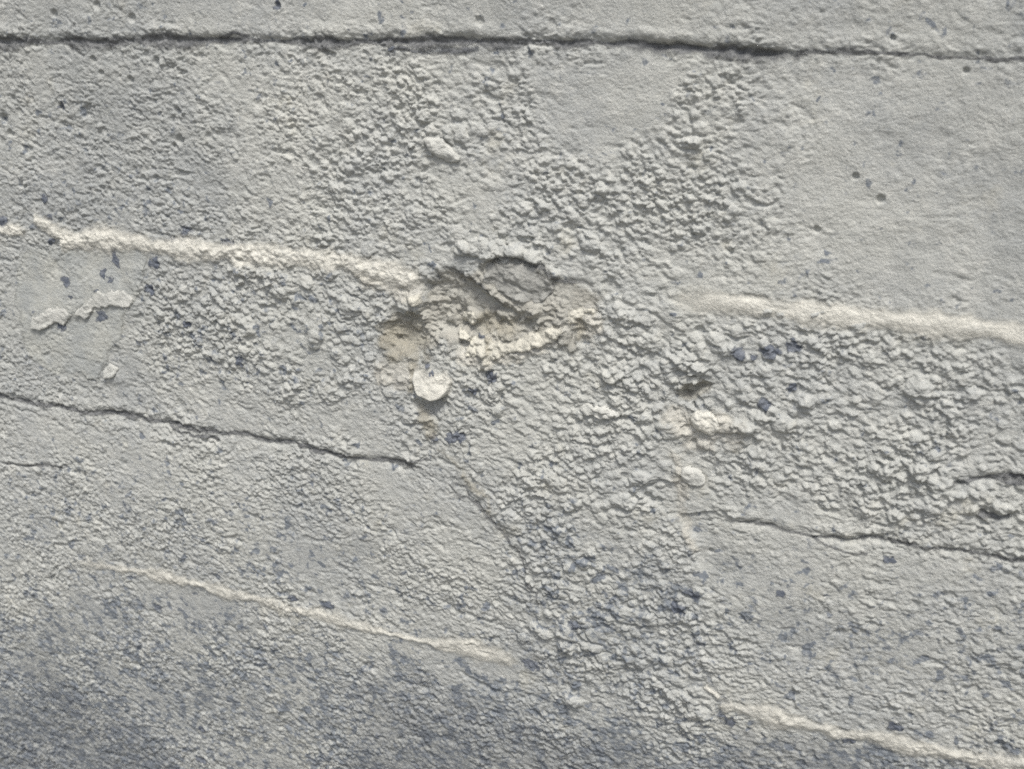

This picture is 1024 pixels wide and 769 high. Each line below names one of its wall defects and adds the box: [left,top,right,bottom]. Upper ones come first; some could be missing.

crack [0,31,1024,63]
peeling [14,246,148,382]
spalling [377,257,598,365]
crack [0,393,428,467]
crack [7,461,69,469]
crack [977,510,1010,519]
crack [738,521,1024,562]